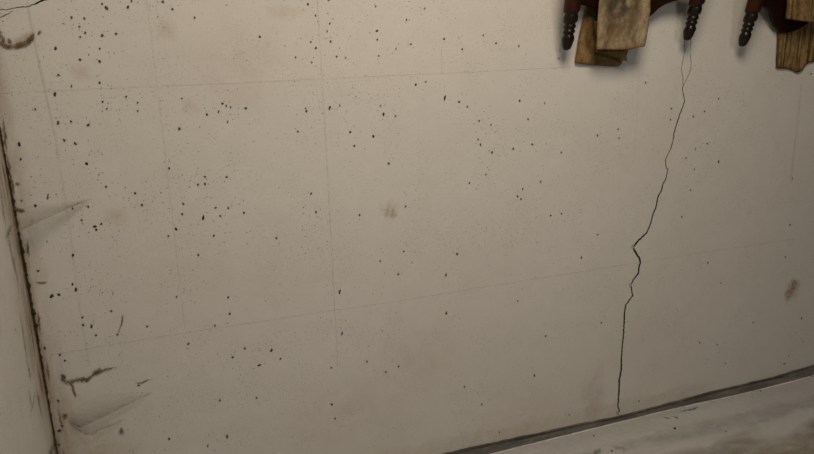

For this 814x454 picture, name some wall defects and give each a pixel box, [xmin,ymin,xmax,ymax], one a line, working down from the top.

crack [0,0,45,18]
crack [0,127,58,454]
crack [452,40,696,454]
crack [722,374,788,391]